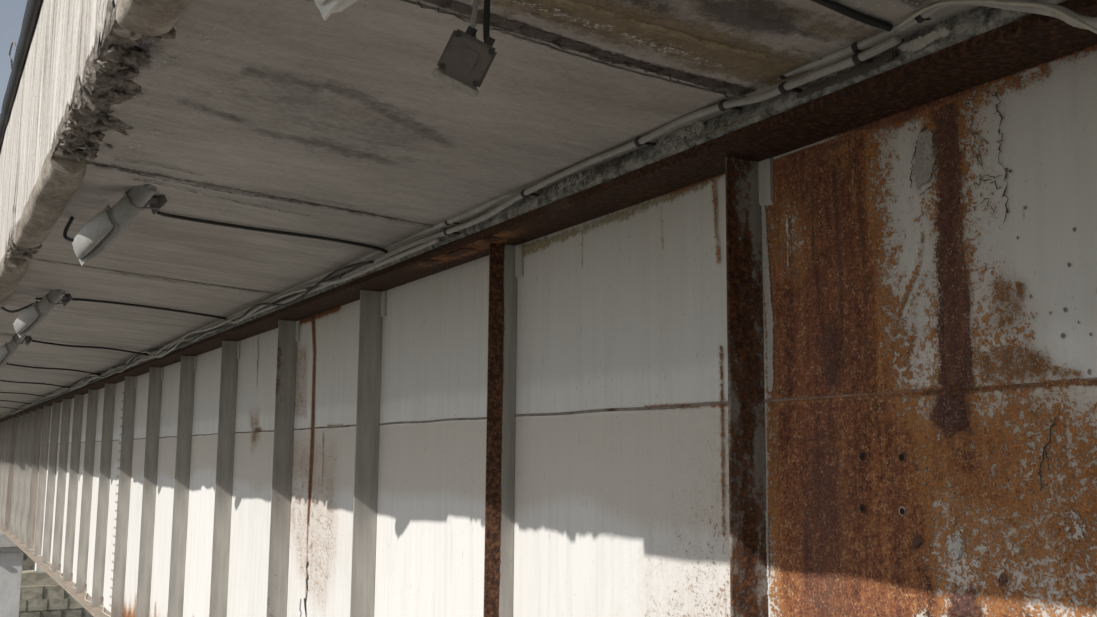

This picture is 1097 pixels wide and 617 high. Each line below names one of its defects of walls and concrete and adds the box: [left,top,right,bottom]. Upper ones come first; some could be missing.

spalling [51,0,176,161]
leakage [479,0,996,99]
leakage [515,116,722,203]
crack [909,124,940,195]
crack [962,88,1011,224]
rust [763,45,1097,617]